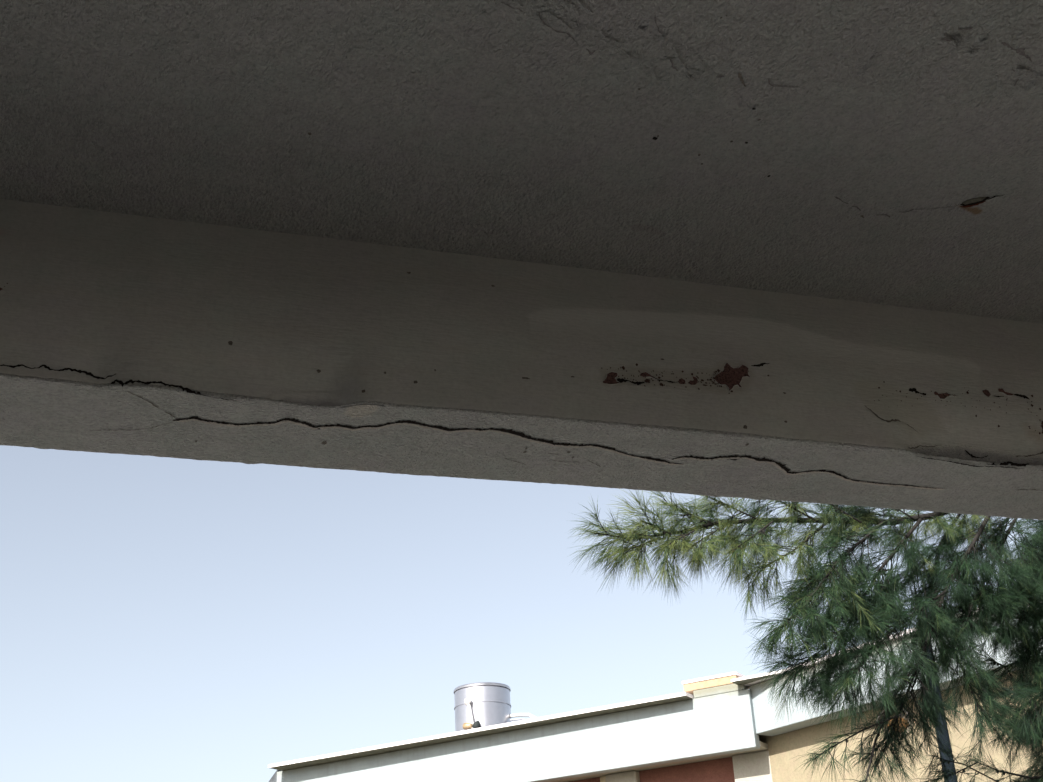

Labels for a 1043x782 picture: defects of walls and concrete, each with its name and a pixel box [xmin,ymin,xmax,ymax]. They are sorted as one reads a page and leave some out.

crack [0,364,943,490]